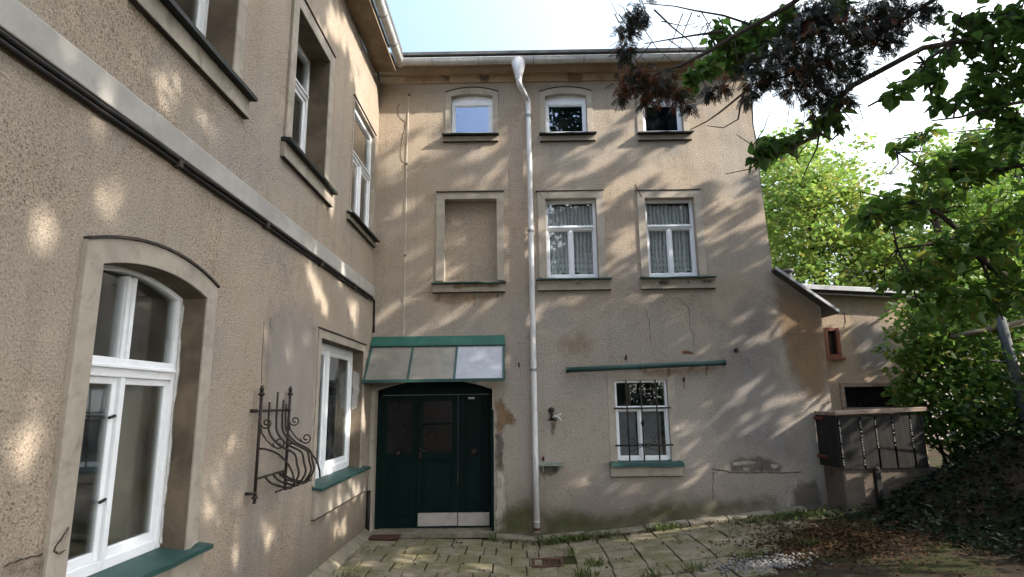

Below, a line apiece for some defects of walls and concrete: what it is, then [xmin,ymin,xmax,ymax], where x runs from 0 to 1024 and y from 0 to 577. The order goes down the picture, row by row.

flaking render [496,400,514,433]
flaking render [731,457,779,471]
crack [4,527,69,567]